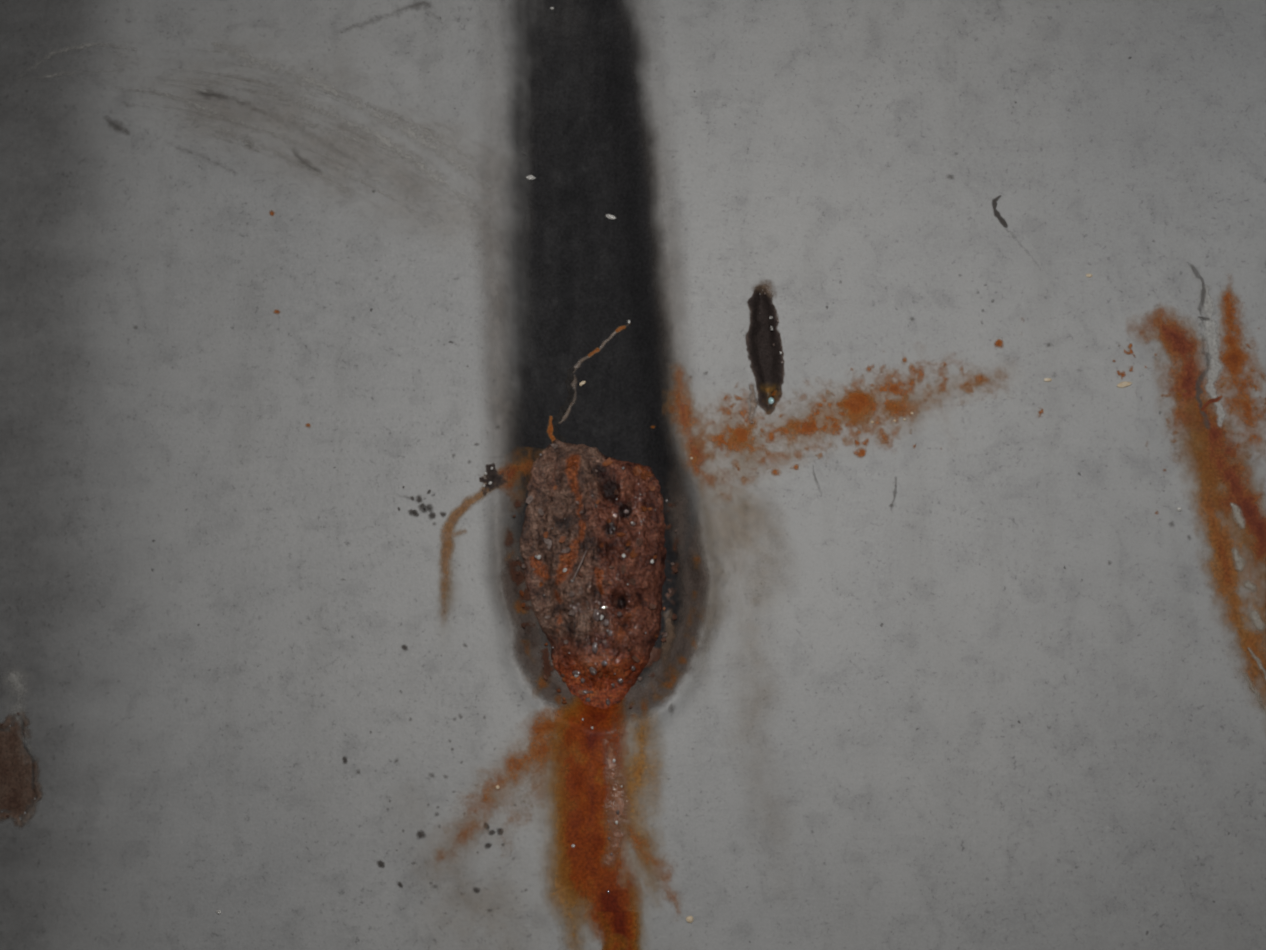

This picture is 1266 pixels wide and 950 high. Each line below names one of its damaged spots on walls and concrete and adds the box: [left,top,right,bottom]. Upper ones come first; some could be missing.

rust [441,439,678,950]
damp [495,0,710,723]
rust [670,358,924,484]
rust [1113,291,1266,705]